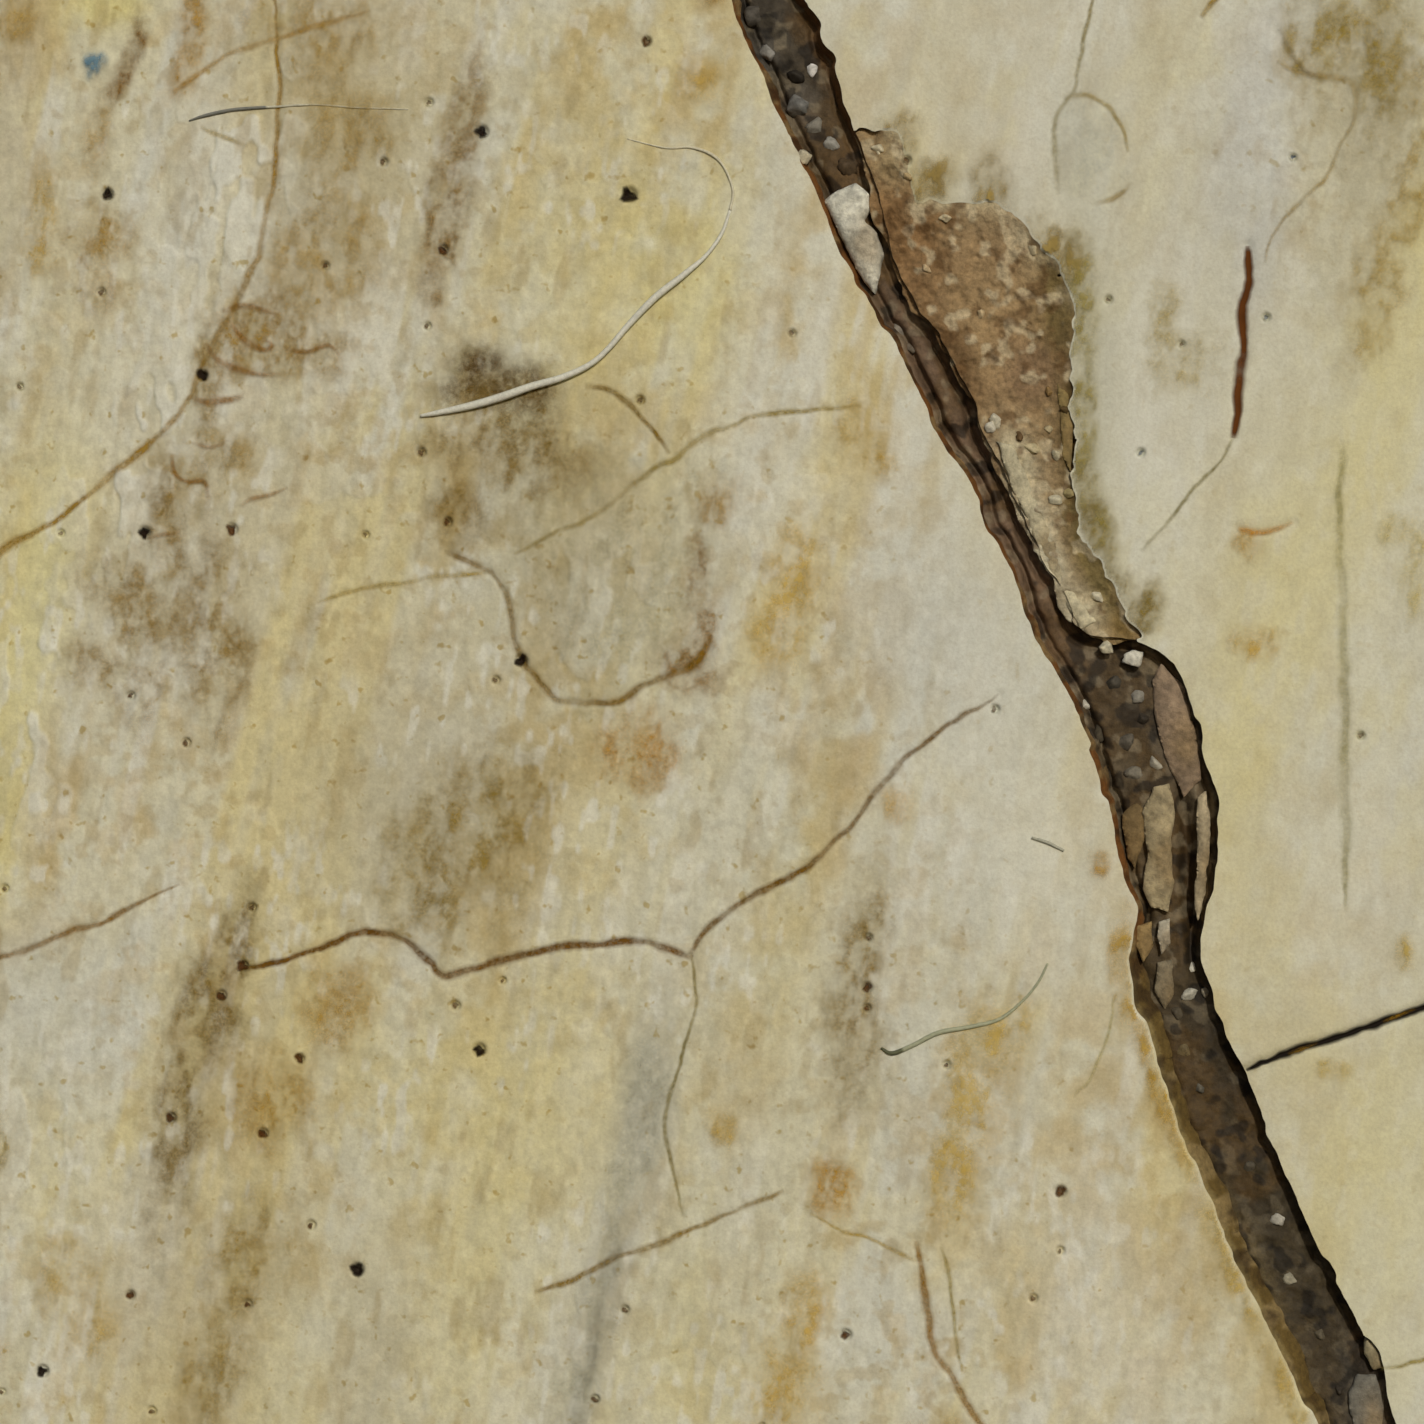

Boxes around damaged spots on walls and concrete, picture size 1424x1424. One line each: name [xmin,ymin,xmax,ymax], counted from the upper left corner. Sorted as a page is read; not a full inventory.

crack [272,45,282,186]
spalling [854,128,1142,645]
crack [0,420,175,554]
crack [640,455,681,479]
crack [732,0,1424,1424]
crack [0,894,157,958]
crack [249,795,873,979]
crack [664,1040,687,1161]